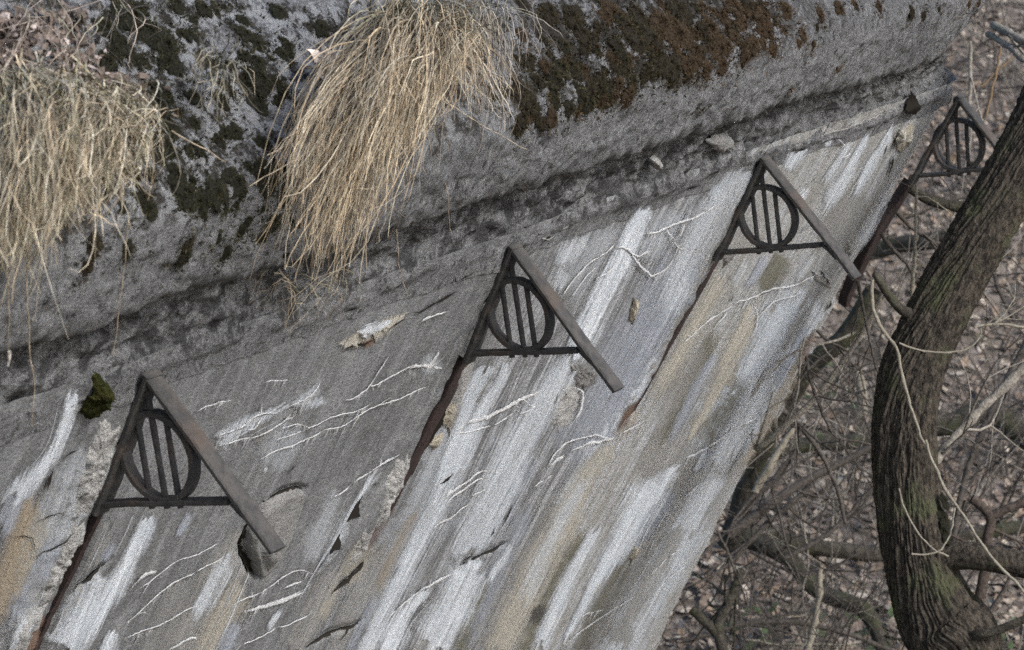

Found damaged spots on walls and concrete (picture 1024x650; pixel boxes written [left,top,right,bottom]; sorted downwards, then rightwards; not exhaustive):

water stain [785,149,807,170]
water stain [824,124,893,243]
crack [563,205,716,295]
water stain [0,389,78,533]
water stain [50,516,156,650]
water stain [173,529,248,650]
spalling [245,488,306,578]
crack [217,352,445,502]
crack [432,470,489,531]
crack [454,390,542,435]
water stain [286,168,828,650]
crack [536,420,645,486]